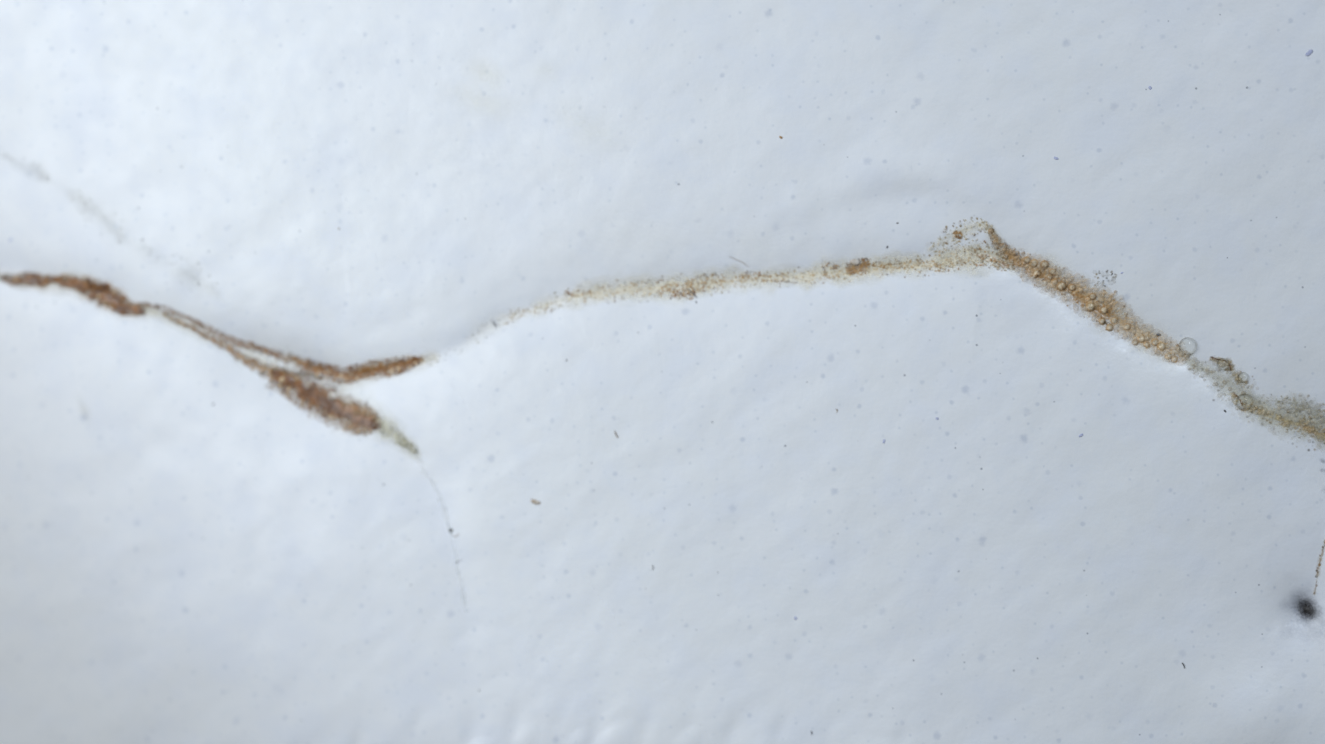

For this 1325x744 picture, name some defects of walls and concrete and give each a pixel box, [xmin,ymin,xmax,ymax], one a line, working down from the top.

rust [499,217,1012,326]
rust [1,272,423,454]